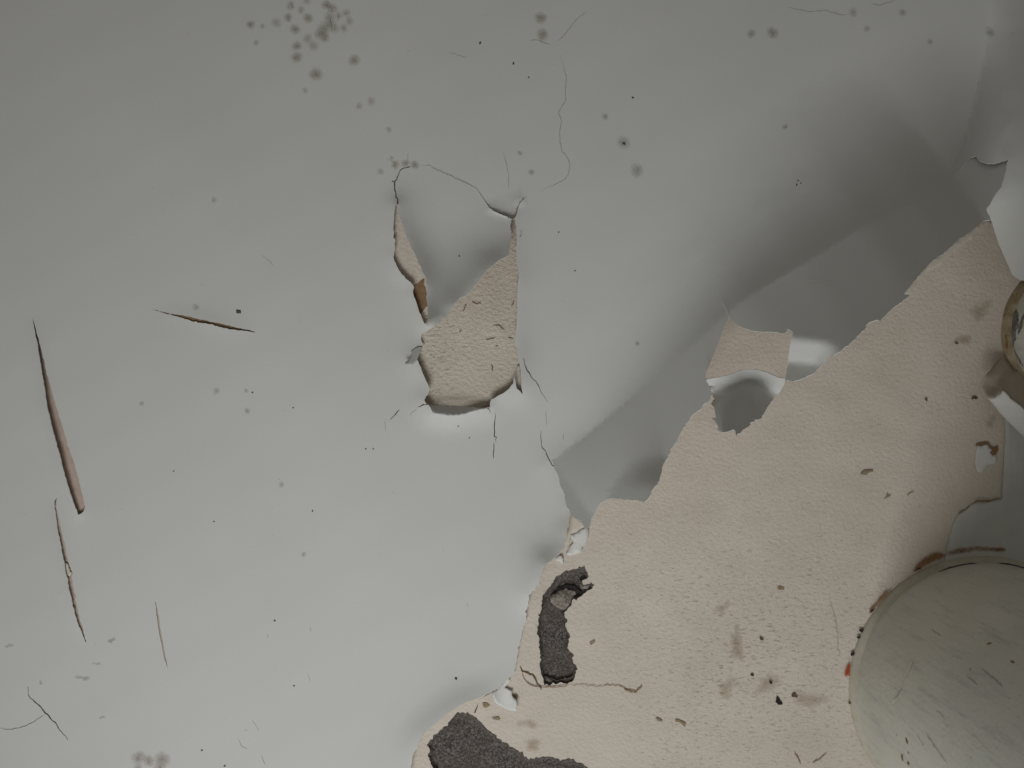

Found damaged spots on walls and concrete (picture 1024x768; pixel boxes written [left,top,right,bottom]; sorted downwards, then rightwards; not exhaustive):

crack [156,310,254,332]
flaking render [393,205,522,416]
crack [33,321,86,641]
flaking render [411,220,1021,768]
crack [3,694,68,740]